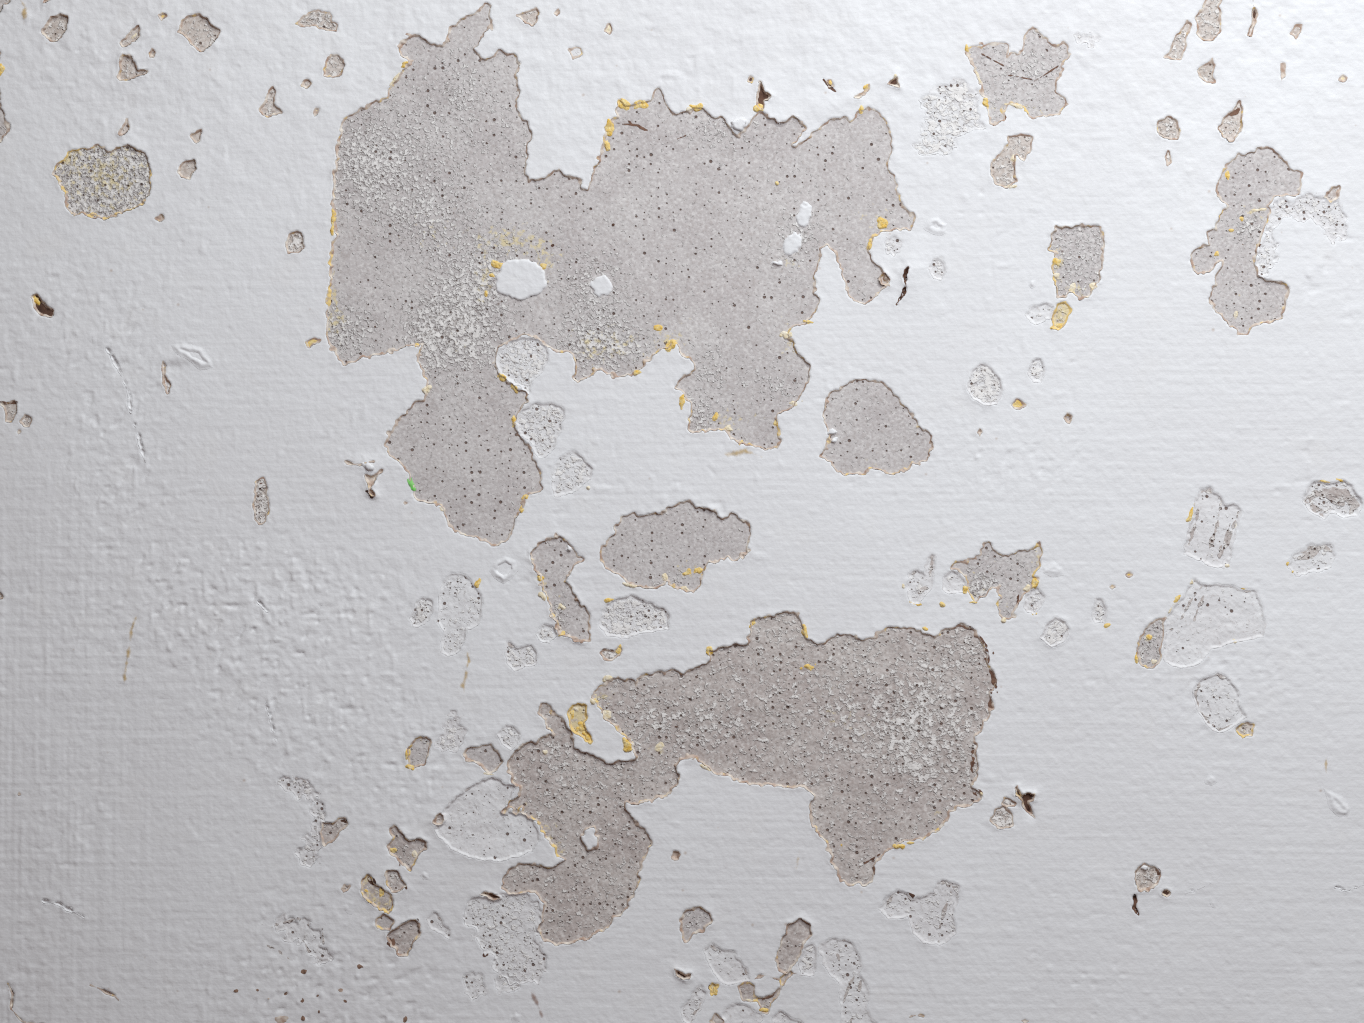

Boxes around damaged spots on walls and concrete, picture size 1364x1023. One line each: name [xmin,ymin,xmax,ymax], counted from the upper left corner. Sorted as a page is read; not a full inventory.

peeling [0,103,10,142]
peeling [52,118,152,220]
peeling [295,3,916,546]
peeling [912,26,1101,189]
peeling [1025,223,1105,330]
peeling [1190,100,1348,335]
peeling [819,379,934,476]
peeling [902,541,1070,647]
peeling [1135,486,1267,738]
peeling [341,499,998,1000]
peeling [989,785,1035,829]
peeling [674,906,877,1023]